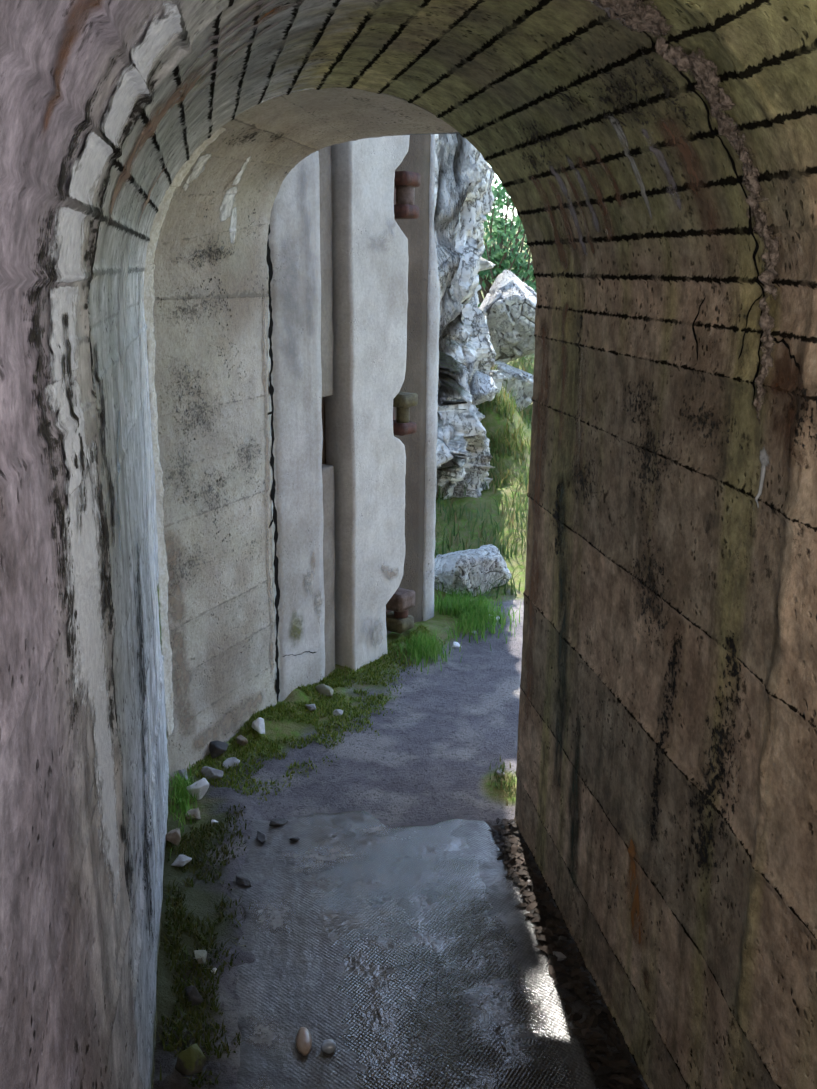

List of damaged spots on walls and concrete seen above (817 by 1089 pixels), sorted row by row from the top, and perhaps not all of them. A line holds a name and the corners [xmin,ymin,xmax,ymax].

crack [614,12,801,405]
water stain [118,124,285,879]
water stain [552,480,580,887]
water stain [649,622,683,848]
water stain [686,631,743,884]